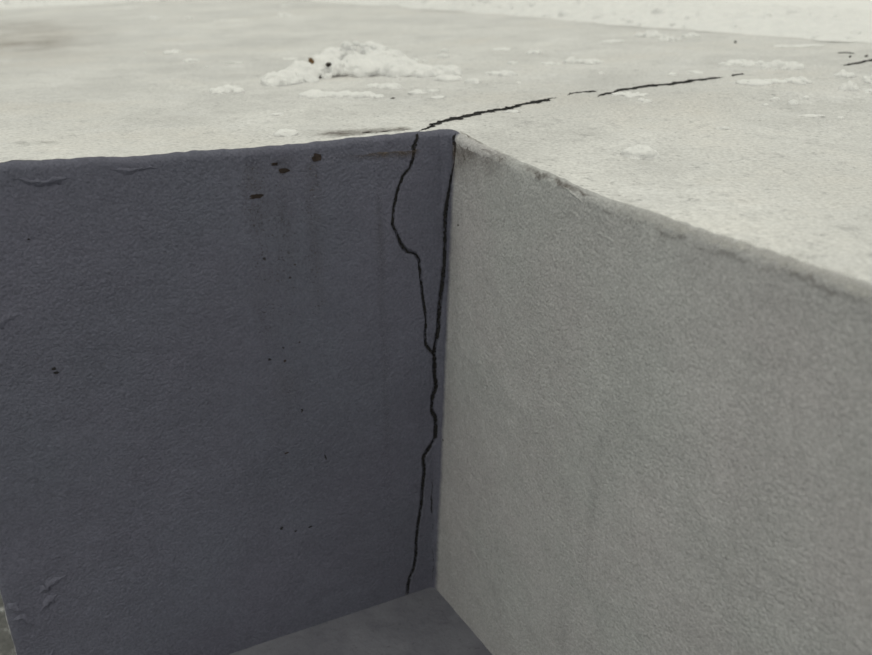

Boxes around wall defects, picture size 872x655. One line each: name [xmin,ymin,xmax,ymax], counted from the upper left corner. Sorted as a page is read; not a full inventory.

crack [838,52,872,66]
crack [391,73,743,594]